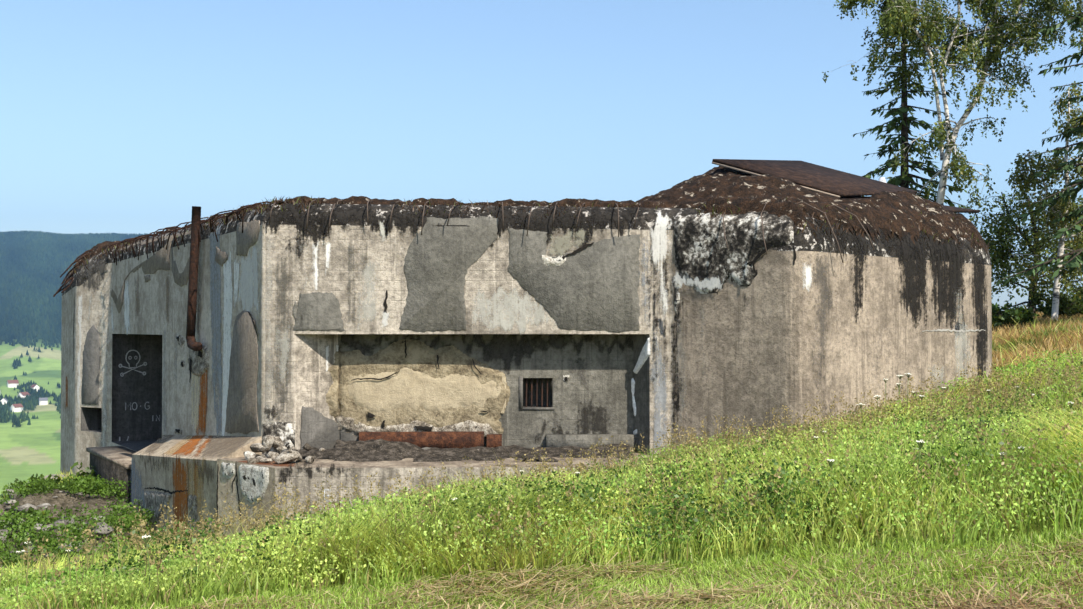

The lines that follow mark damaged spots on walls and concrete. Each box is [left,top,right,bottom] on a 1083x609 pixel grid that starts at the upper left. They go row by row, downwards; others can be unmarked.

spalling [53,249,93,297]
peeling [107,199,284,313]
peeling [399,201,650,416]
water stain [802,217,988,382]
crack [144,471,189,521]
rust [172,370,213,538]
crack [216,467,242,532]
peeling [222,310,359,504]